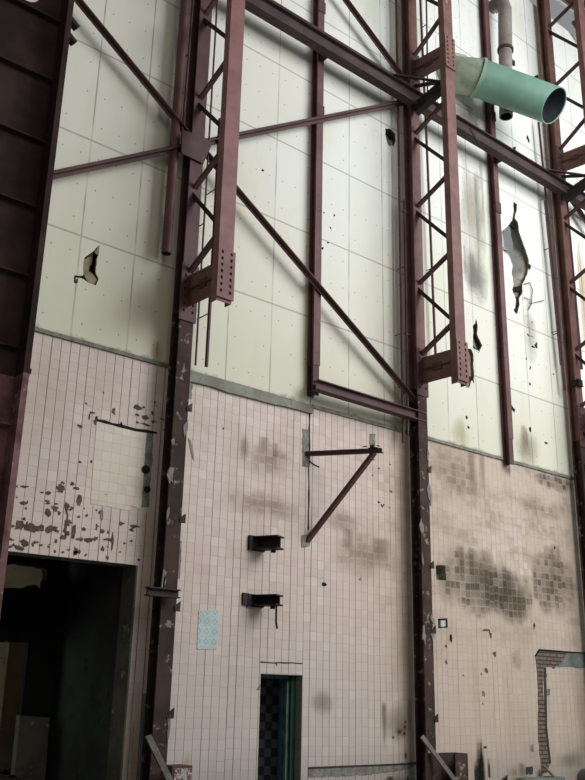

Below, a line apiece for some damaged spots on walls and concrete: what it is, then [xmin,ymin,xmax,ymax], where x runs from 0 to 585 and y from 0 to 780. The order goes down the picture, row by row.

peeling [133,401,165,507]
spalling [9,481,140,559]
damp [475,746,490,780]
flaking render [526,649,585,775]